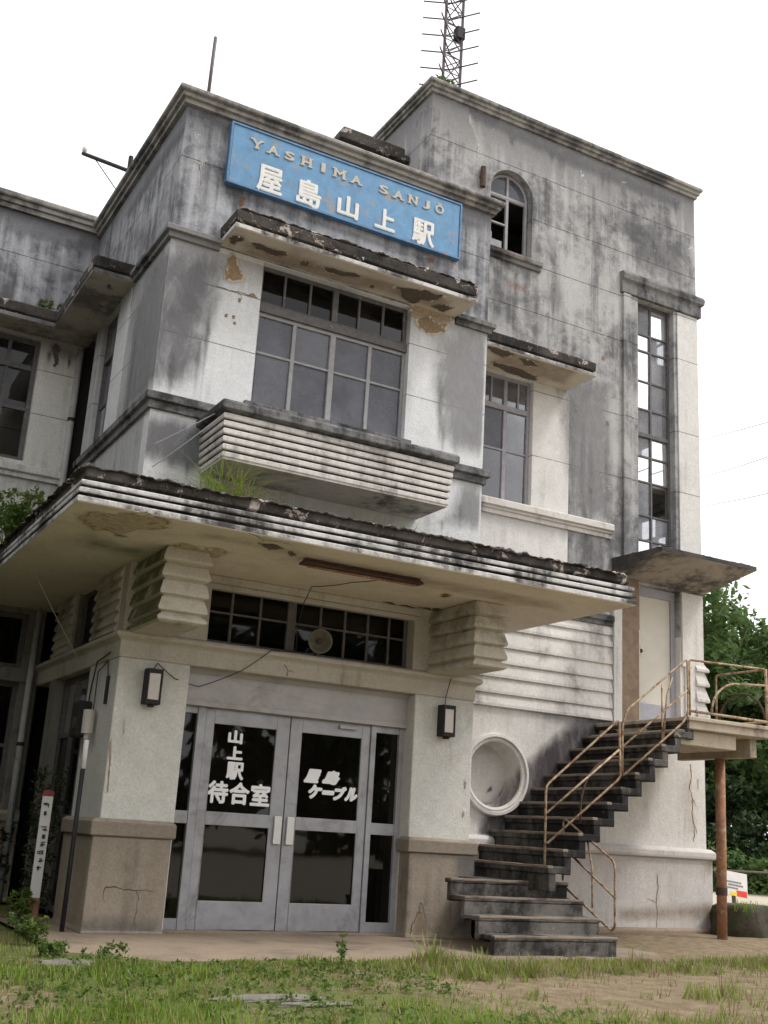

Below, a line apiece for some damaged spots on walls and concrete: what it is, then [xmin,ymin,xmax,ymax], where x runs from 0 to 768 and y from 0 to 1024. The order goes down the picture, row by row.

spalling [223,235,289,283]
peeling [300,261,360,277]
damp [124,253,216,410]
peeling [392,286,453,336]
peeling [487,345,539,382]
peeling [74,511,172,538]
damp [481,718,612,835]
crack [689,764,697,841]
crack [103,886,149,925]